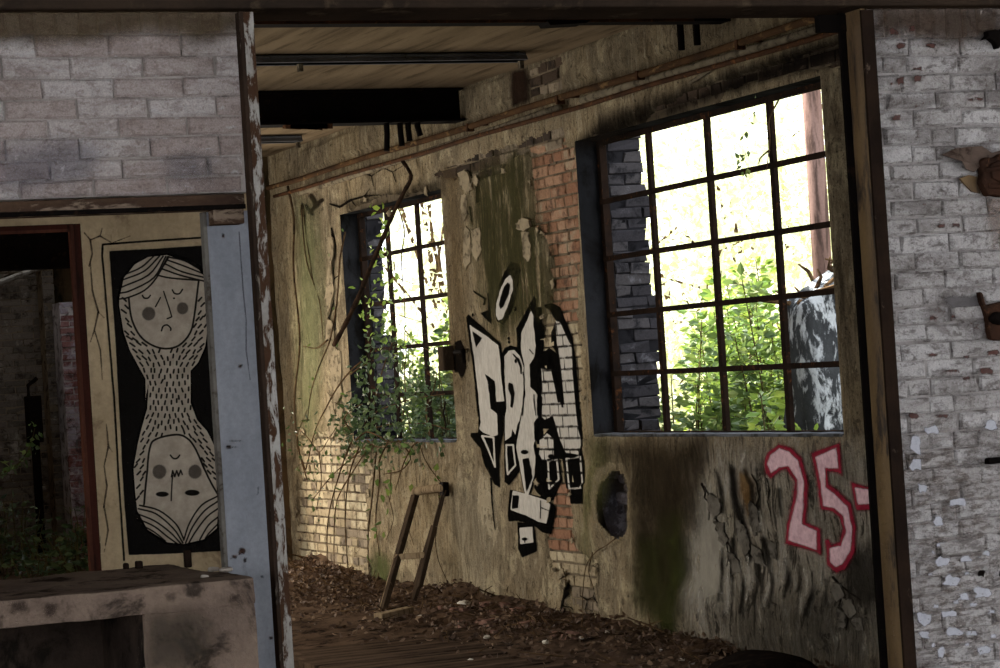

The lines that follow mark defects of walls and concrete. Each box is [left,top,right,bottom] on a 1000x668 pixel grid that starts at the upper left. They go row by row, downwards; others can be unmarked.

corrosion [511,69,529,106]
crack [84,230,125,370]
corrosion [235,11,284,668]
spalling [293,237,374,575]
spalling [434,127,586,472]
spalling [533,459,599,618]
spalling [602,471,628,539]
damp [601,439,827,634]
crack [701,483,734,578]
crack [751,474,771,522]
crack [832,576,861,629]
peeling [906,414,996,668]